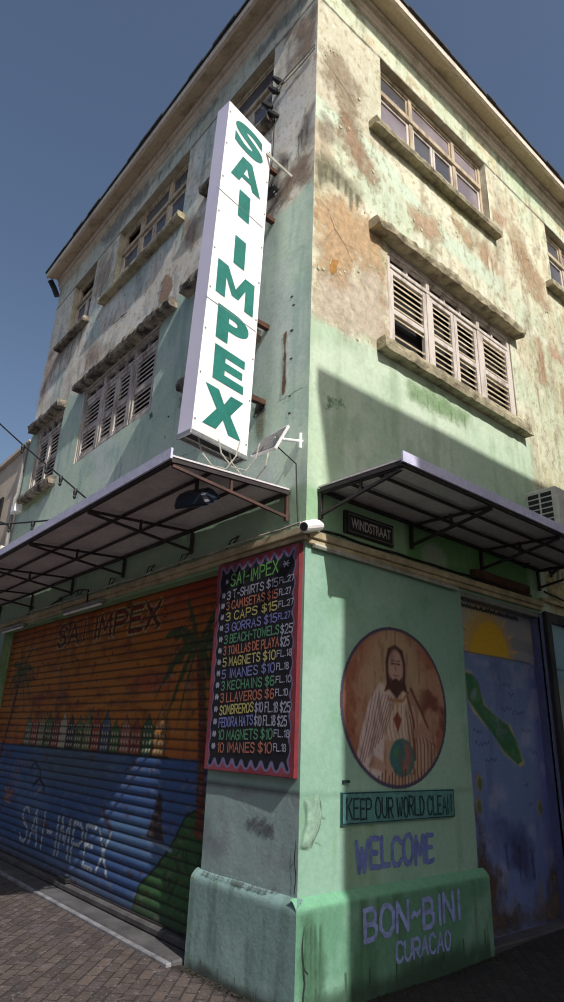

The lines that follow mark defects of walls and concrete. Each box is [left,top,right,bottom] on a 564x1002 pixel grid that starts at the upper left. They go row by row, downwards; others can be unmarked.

peeling [289,3,318,67]
peeling [321,49,376,186]